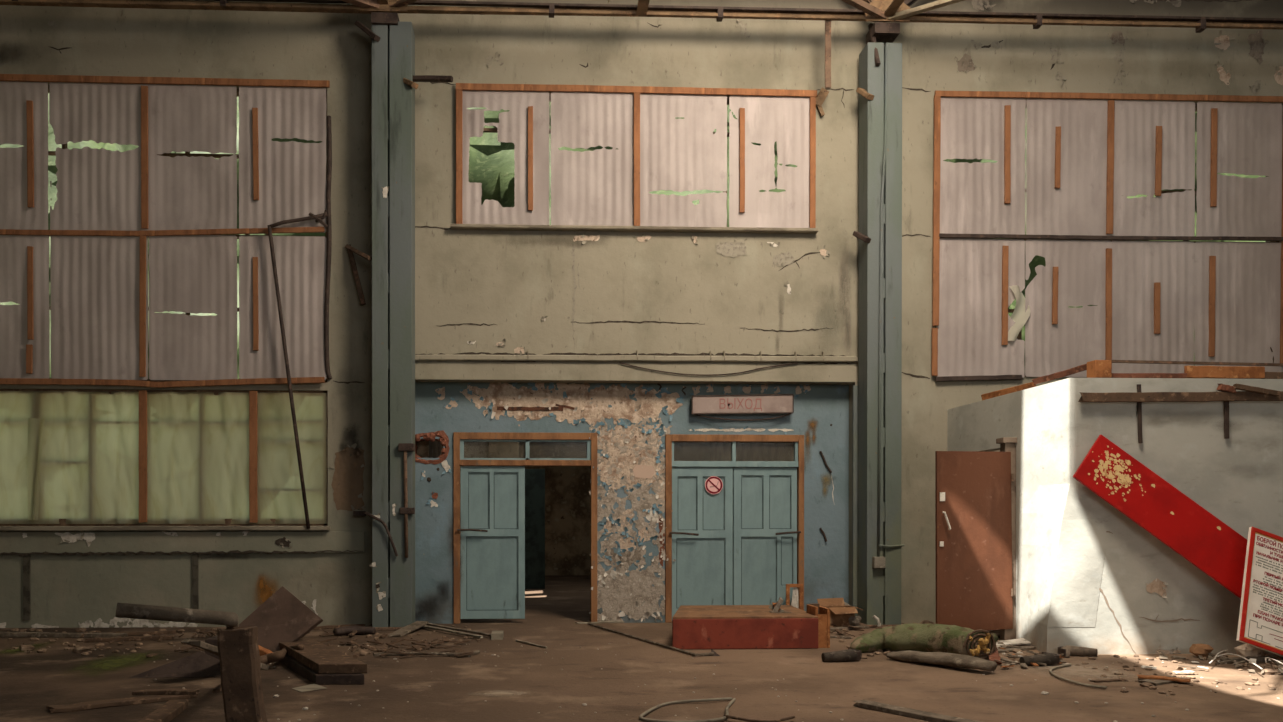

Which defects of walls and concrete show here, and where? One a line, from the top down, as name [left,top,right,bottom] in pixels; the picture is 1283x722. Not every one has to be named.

crack [415,231,854,395]
peeling [329,443,397,520]
peeling [435,382,732,622]
peeling [78,617,197,628]